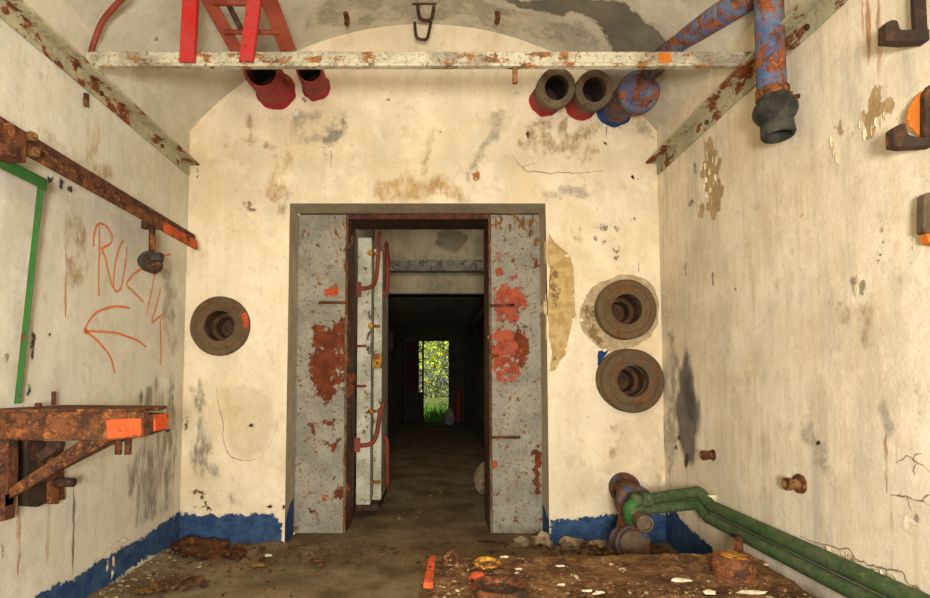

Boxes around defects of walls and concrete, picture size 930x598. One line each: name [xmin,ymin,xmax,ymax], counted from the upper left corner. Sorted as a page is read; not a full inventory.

peeling [830,85,895,164]
crack [515,159,604,178]
peeling [688,137,724,220]
spalling [543,236,669,372]
leakage [129,433,172,518]
crack [892,453,930,509]